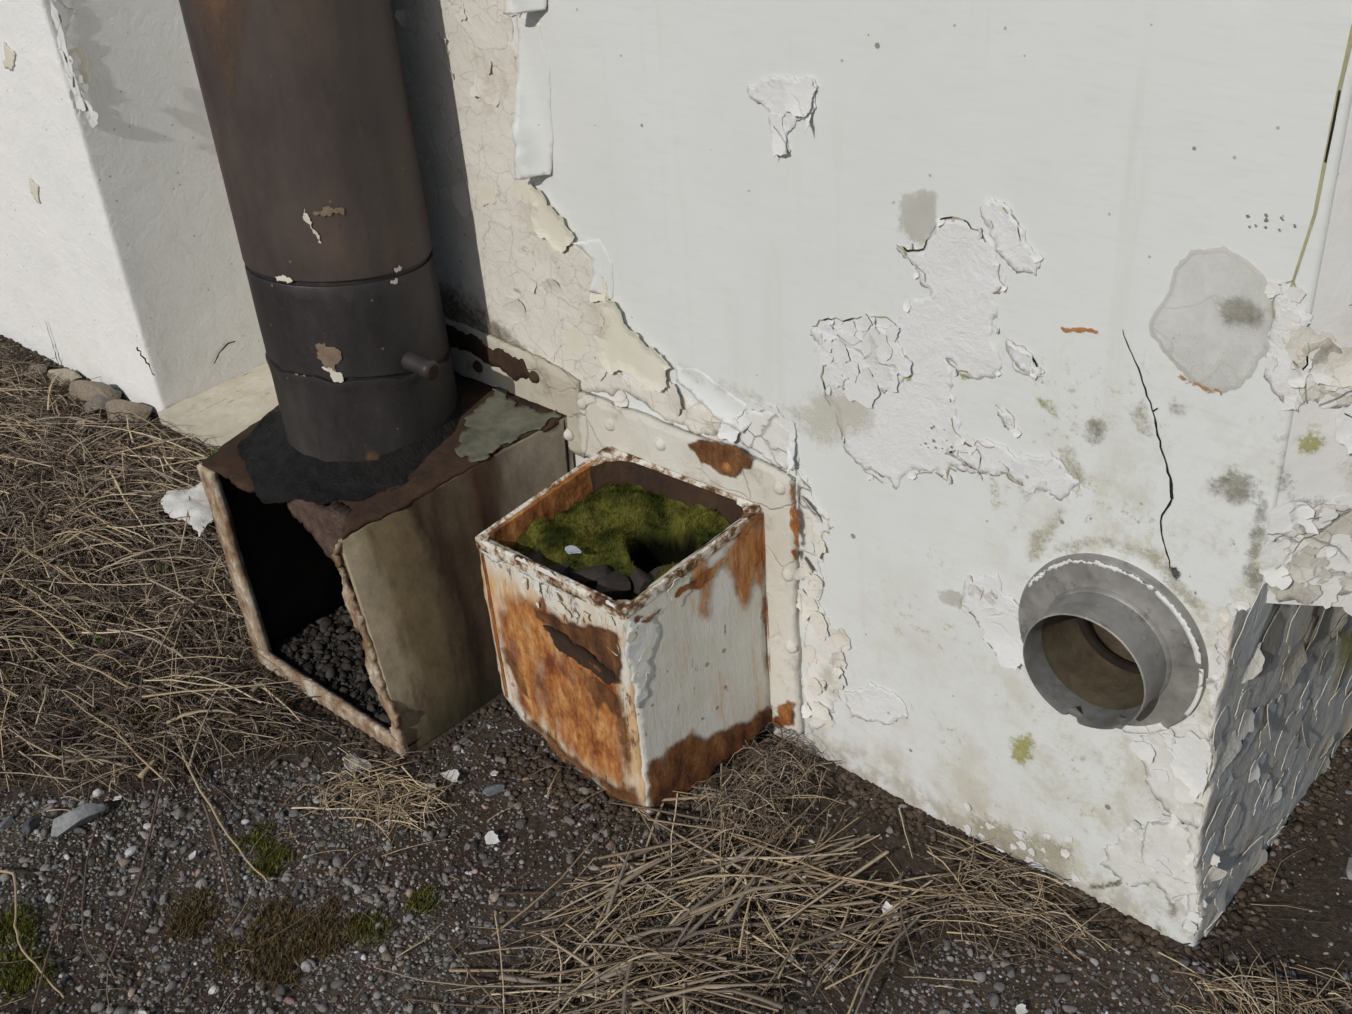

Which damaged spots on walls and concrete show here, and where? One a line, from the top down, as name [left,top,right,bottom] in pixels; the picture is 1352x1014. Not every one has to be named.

peeling [49,0,93,114]
damp [901,190,935,242]
peeling [390,0,851,732]
corrosion [688,440,752,478]
peeling [810,199,1080,501]
crack [1122,330,1174,568]
peeling [1261,278,1352,454]
peeling [960,573,1025,670]
peeling [1100,495,1352,937]
peeling [963,802,1080,887]